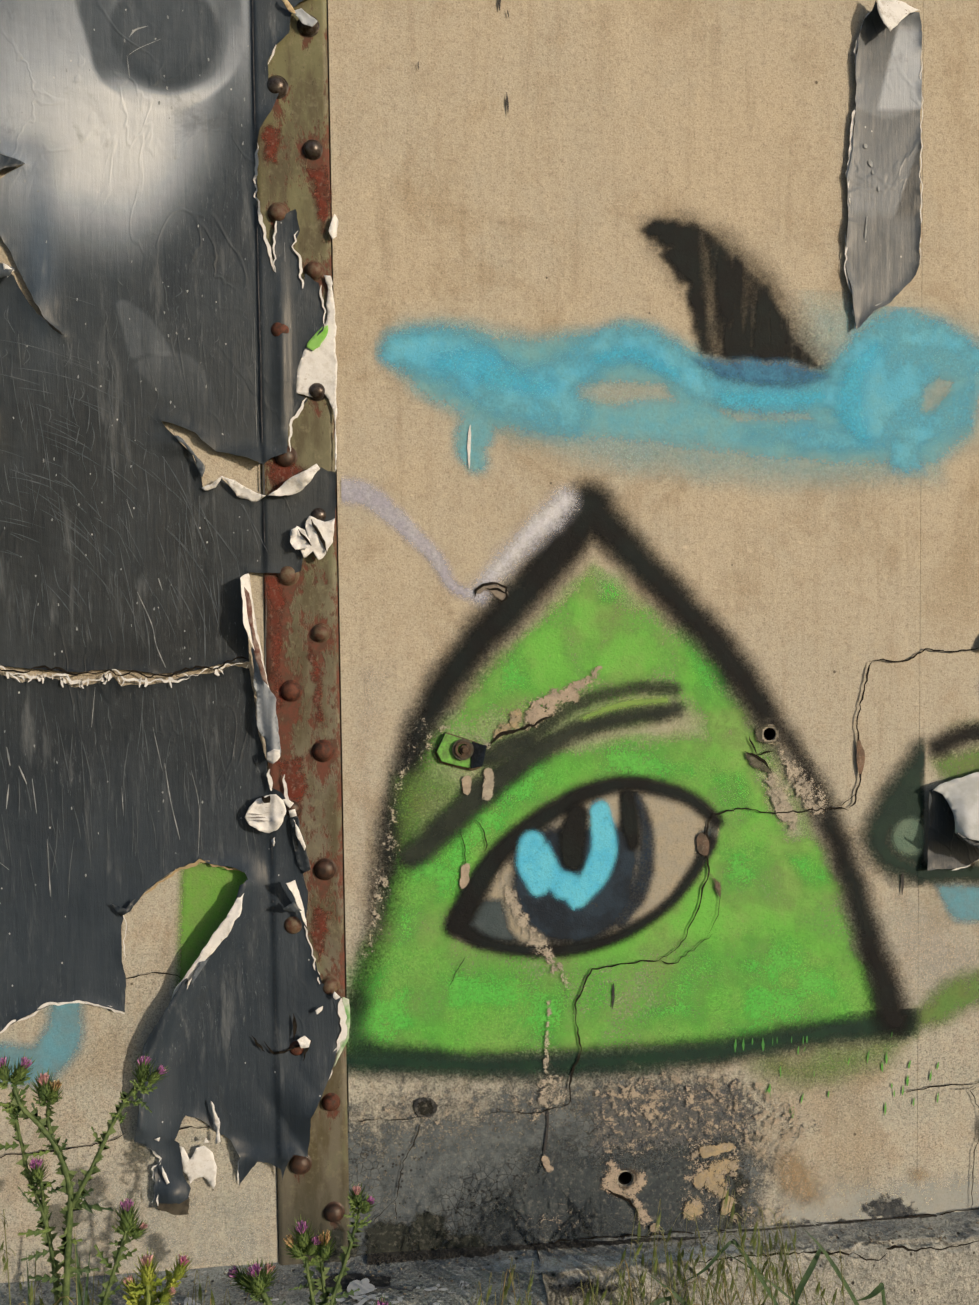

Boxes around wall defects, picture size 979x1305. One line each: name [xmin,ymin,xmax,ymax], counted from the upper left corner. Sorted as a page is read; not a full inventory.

rust [261,125,281,163]
rust [306,165,332,232]
rust [269,462,304,491]
rust [308,650,324,723]
peeling [475,666,602,749]
crack [856,648,978,741]
rust [277,756,308,809]
rust [311,908,333,962]
crack [484,774,862,1116]
crack [908,1082,979,1107]
peeling [493,1065,808,1274]
crack [526,1139,979,1263]